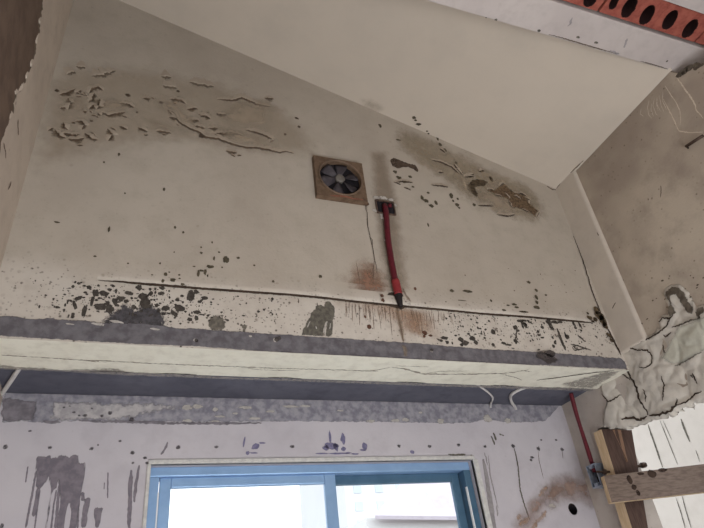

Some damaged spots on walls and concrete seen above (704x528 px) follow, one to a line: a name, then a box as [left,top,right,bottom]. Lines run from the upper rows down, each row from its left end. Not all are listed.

peeling [46,61,138,146]
peeling [143,69,294,157]
spalling [391,158,418,190]
peeling [396,116,539,217]
water stain [33,272,250,326]
water stain [193,251,240,277]
crack [97,206,702,421]
corrosion [346,263,454,342]
water stain [430,281,614,351]
water stain [25,455,103,528]